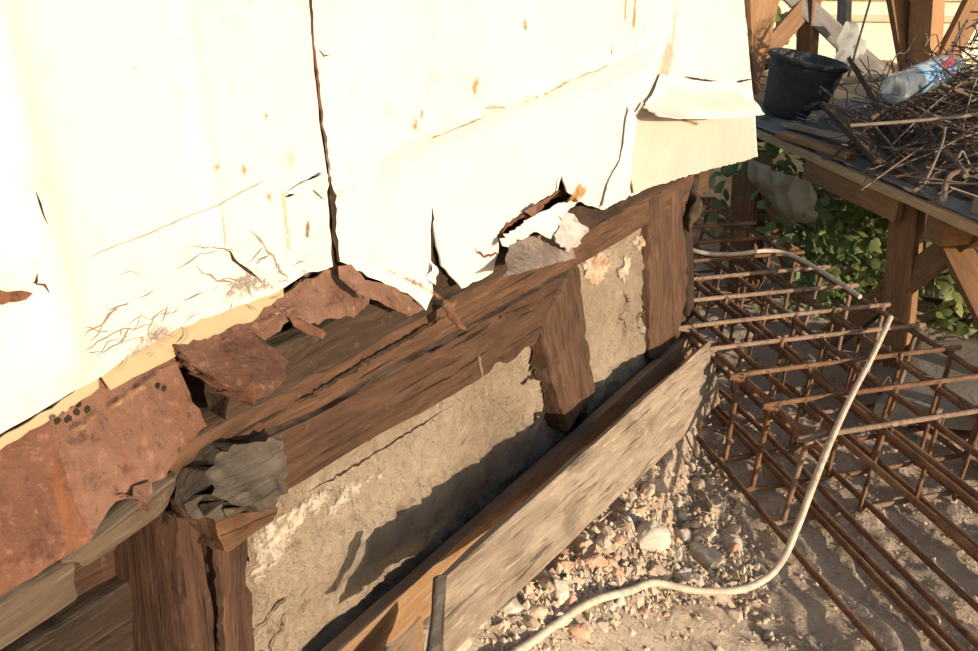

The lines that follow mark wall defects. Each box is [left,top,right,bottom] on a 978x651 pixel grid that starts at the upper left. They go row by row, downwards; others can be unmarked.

crack [286,0,340,264]
peeling [524,203,544,217]
crack [85,181,306,372]
peeling [427,260,439,285]
peeling [583,252,631,285]
corrosion [0,264,423,596]
crack [309,409,445,491]